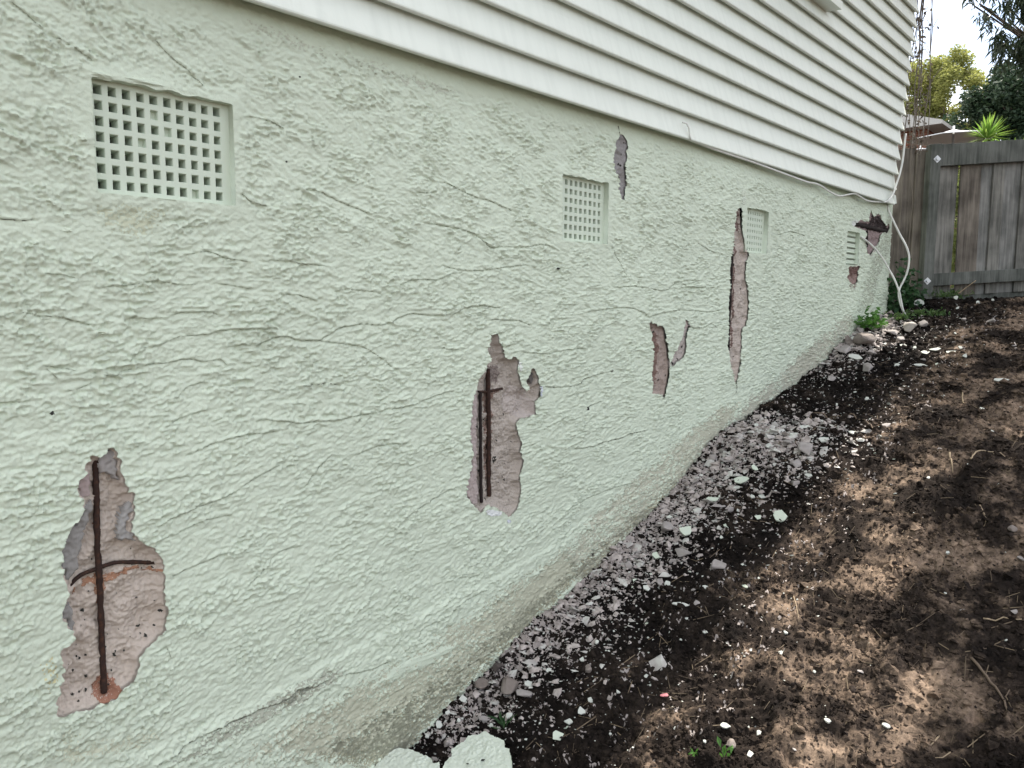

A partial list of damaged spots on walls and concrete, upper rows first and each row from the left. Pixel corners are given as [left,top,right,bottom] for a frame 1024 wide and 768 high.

spalling [613,134,628,200]
crack [401,224,558,285]
crack [590,247,722,328]
spalling [727,208,749,382]
spalling [847,265,859,284]
spalling [852,213,890,254]
crack [103,305,530,426]
spalling [649,320,691,396]
peeling [813,310,967,393]
spalling [466,334,543,523]
spalling [56,448,169,717]
peeling [425,410,895,746]